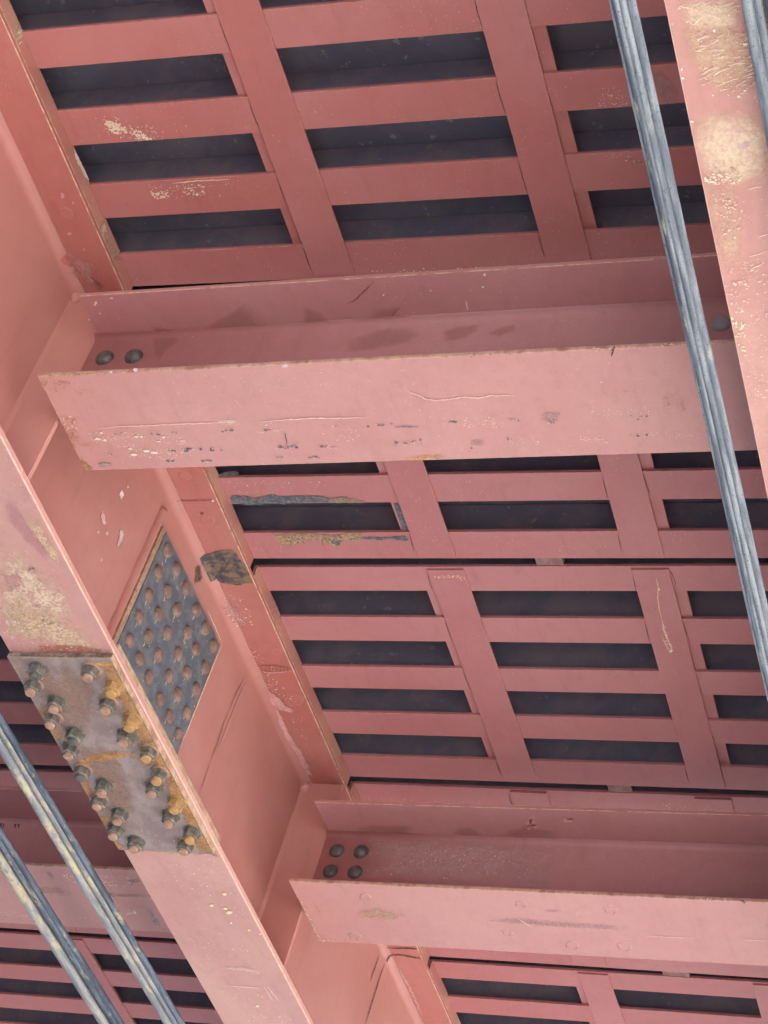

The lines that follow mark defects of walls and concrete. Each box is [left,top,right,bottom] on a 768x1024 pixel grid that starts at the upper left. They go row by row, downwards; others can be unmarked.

peeling [88,431,224,466]
peeling [219,471,364,505]
peeling [255,503,408,552]
peeling [195,550,253,585]
rust [8,649,215,856]